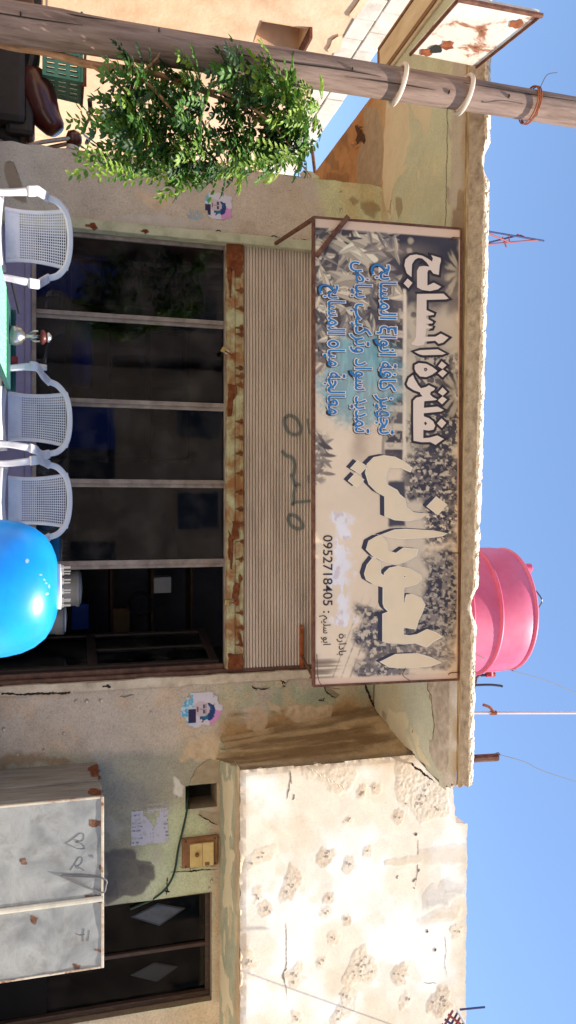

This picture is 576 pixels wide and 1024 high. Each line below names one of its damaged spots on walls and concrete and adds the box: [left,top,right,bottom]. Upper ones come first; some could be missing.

corrosion [227,365,244,456]
corrosion [227,489,244,670]
water stain [216,700,388,768]
crack [365,685,379,714]
spalling [355,681,452,827]
crack [411,762,434,782]
spalling [315,844,374,876]
crack [280,926,288,1001]
spalling [284,891,353,991]
spalling [329,943,455,1024]